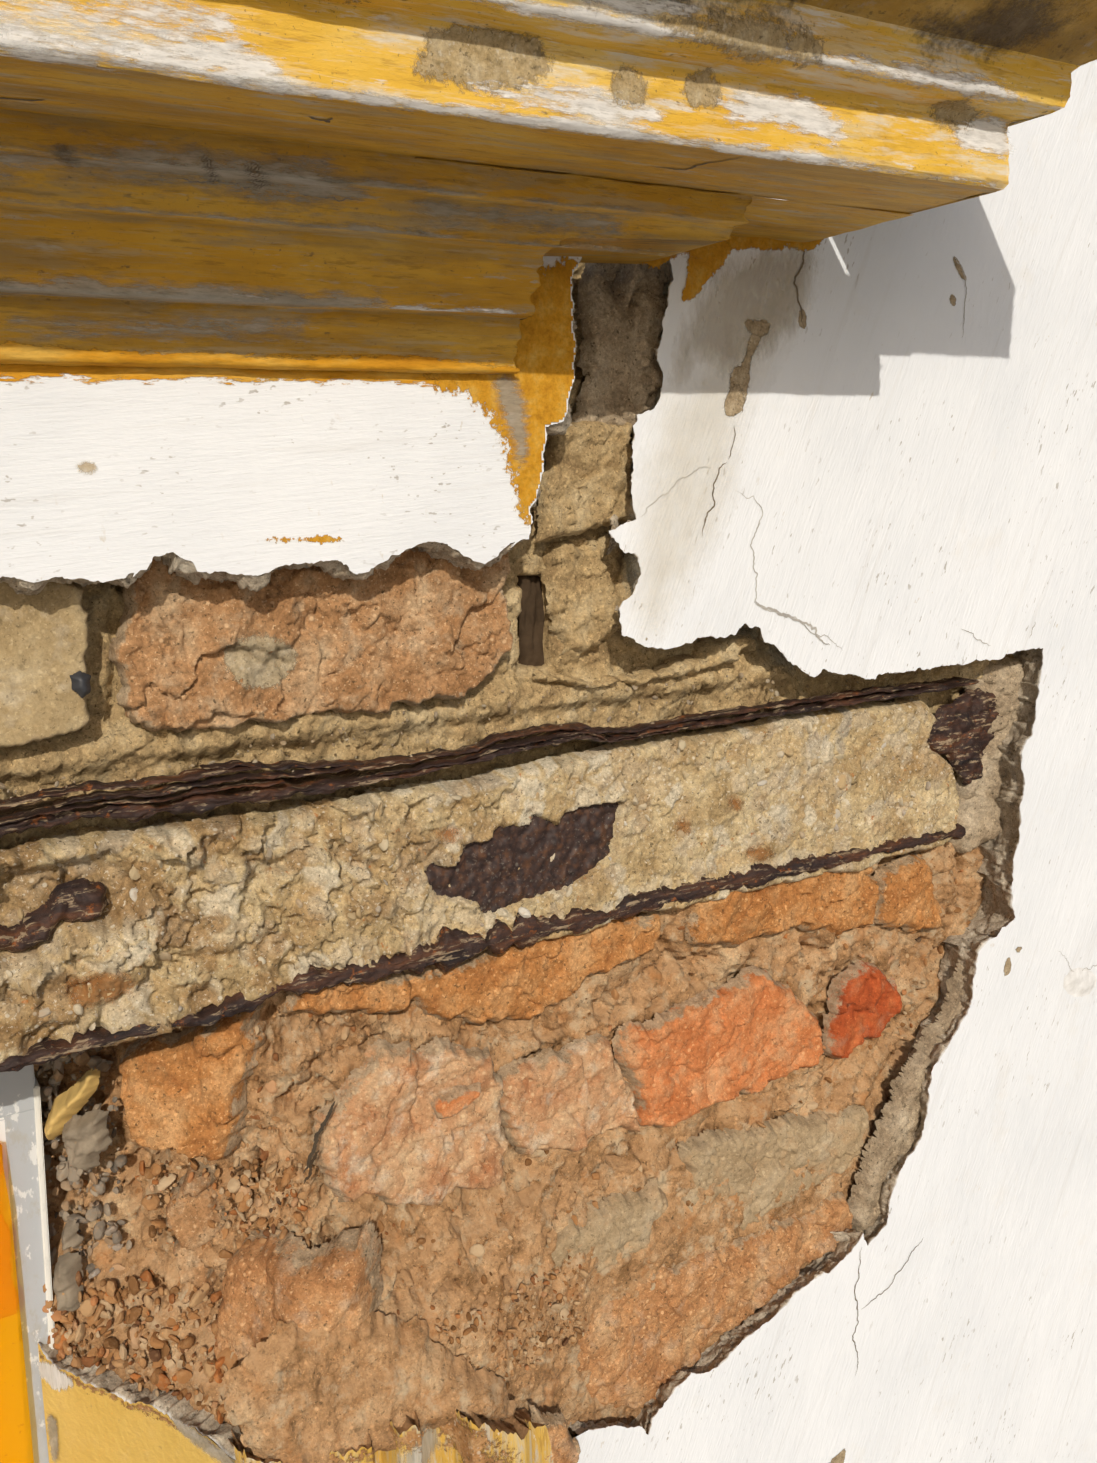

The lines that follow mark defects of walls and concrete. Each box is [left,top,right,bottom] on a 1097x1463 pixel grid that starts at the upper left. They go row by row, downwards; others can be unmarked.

peeling [0,0,294,95]
peeling [682,67,847,146]
crack [793,252,807,329]
spalling [0,258,788,689]
crack [641,428,841,648]
corrosion [0,683,931,825]
corrosion [927,688,1003,786]
corrosion [424,802,618,914]
corrosion [0,878,111,953]
spalling [528,648,1043,1463]
crack [852,1239,923,1372]
crack [829,1448,846,1463]